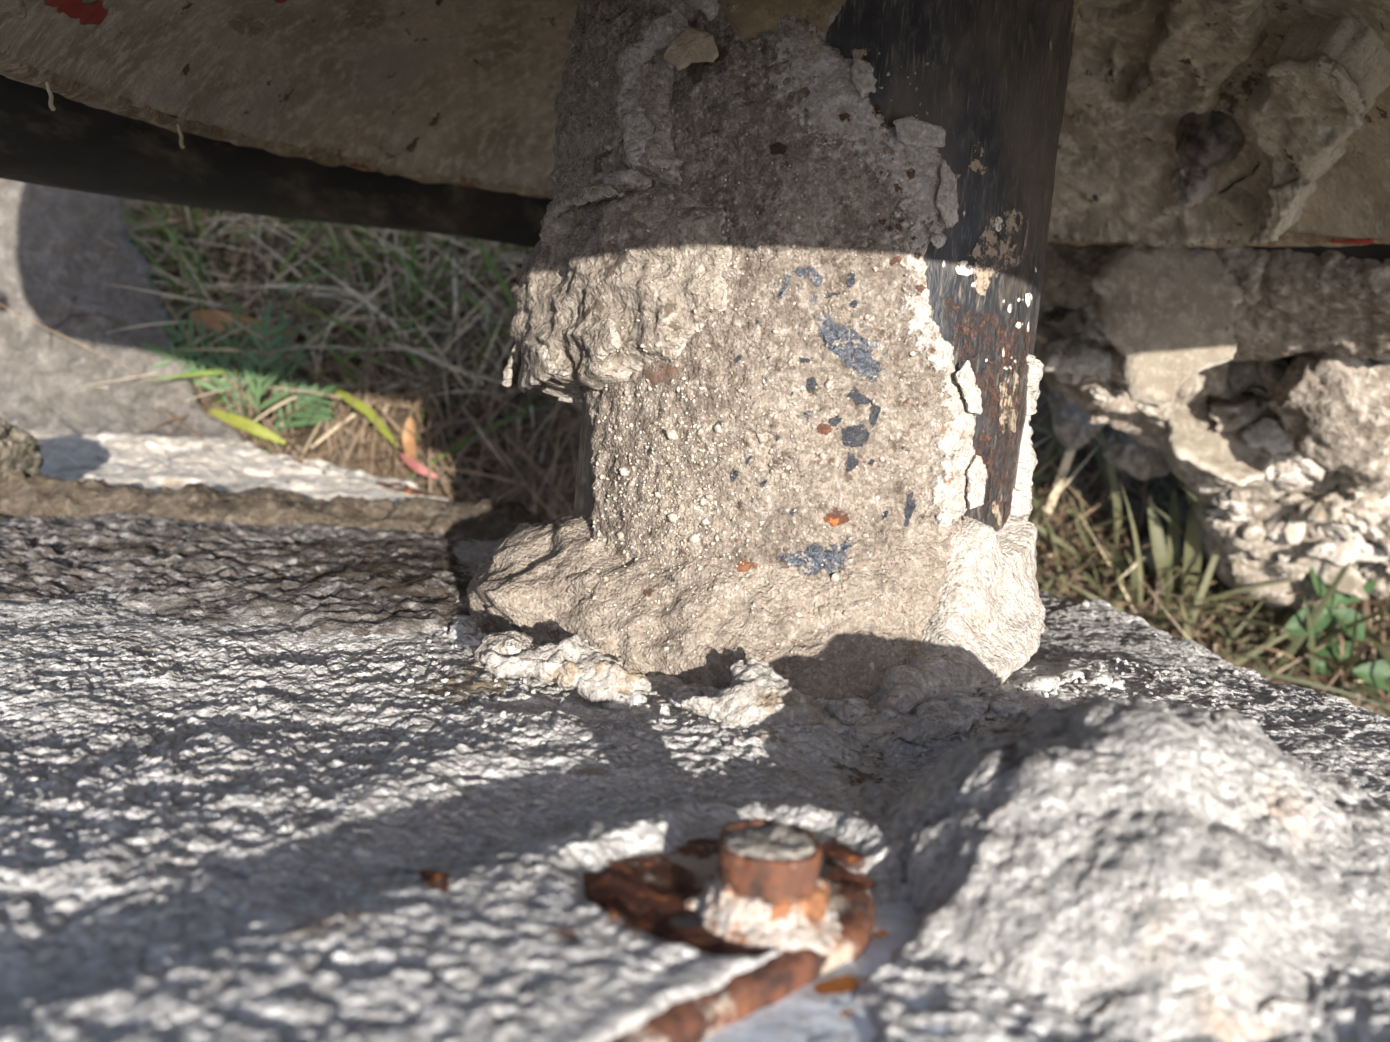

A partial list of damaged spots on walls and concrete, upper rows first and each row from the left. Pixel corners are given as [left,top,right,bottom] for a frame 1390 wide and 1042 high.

peeling [44,0,108,25]
spalling [687,46,729,85]
spalling [770,142,786,154]
rust [944,297,1034,529]
rust [819,837,878,895]
rust [584,854,727,945]
rust [813,975,861,1017]